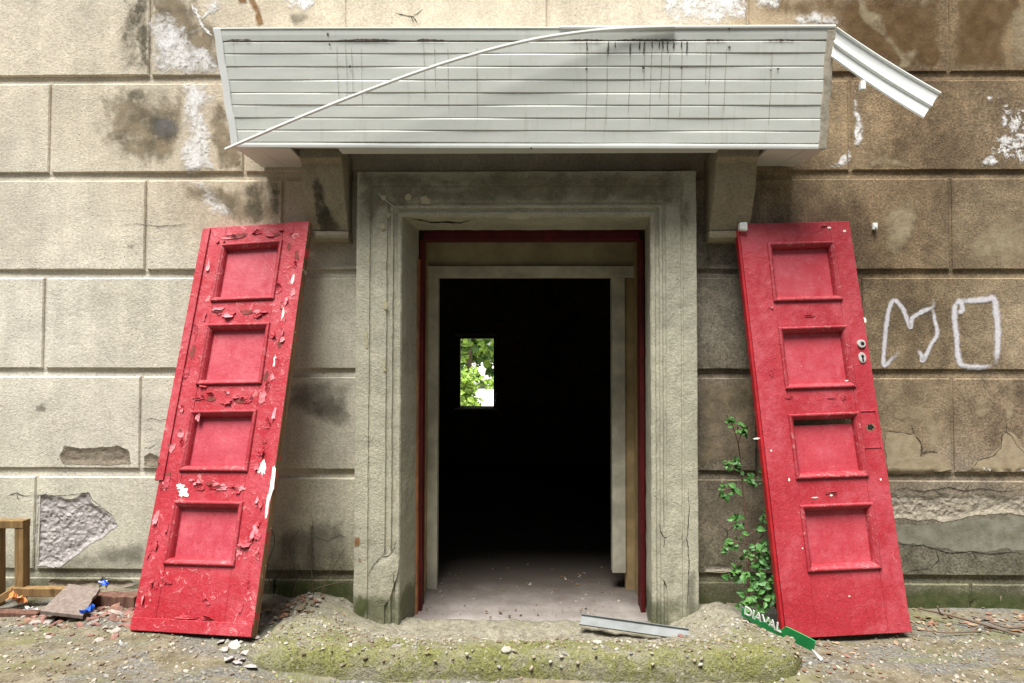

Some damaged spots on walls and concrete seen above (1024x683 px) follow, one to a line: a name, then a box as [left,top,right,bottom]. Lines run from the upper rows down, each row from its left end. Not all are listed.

leakage [105,0,278,221]
leakage [838,101,862,164]
leakage [984,101,1024,164]
leakage [313,182,338,231]
crack [378,193,471,225]
flaking render [59,445,131,465]
peeling [880,432,952,480]
peeling [967,431,1024,474]
flaking render [891,491,1024,522]
flaking render [35,493,155,605]
crack [659,495,690,605]